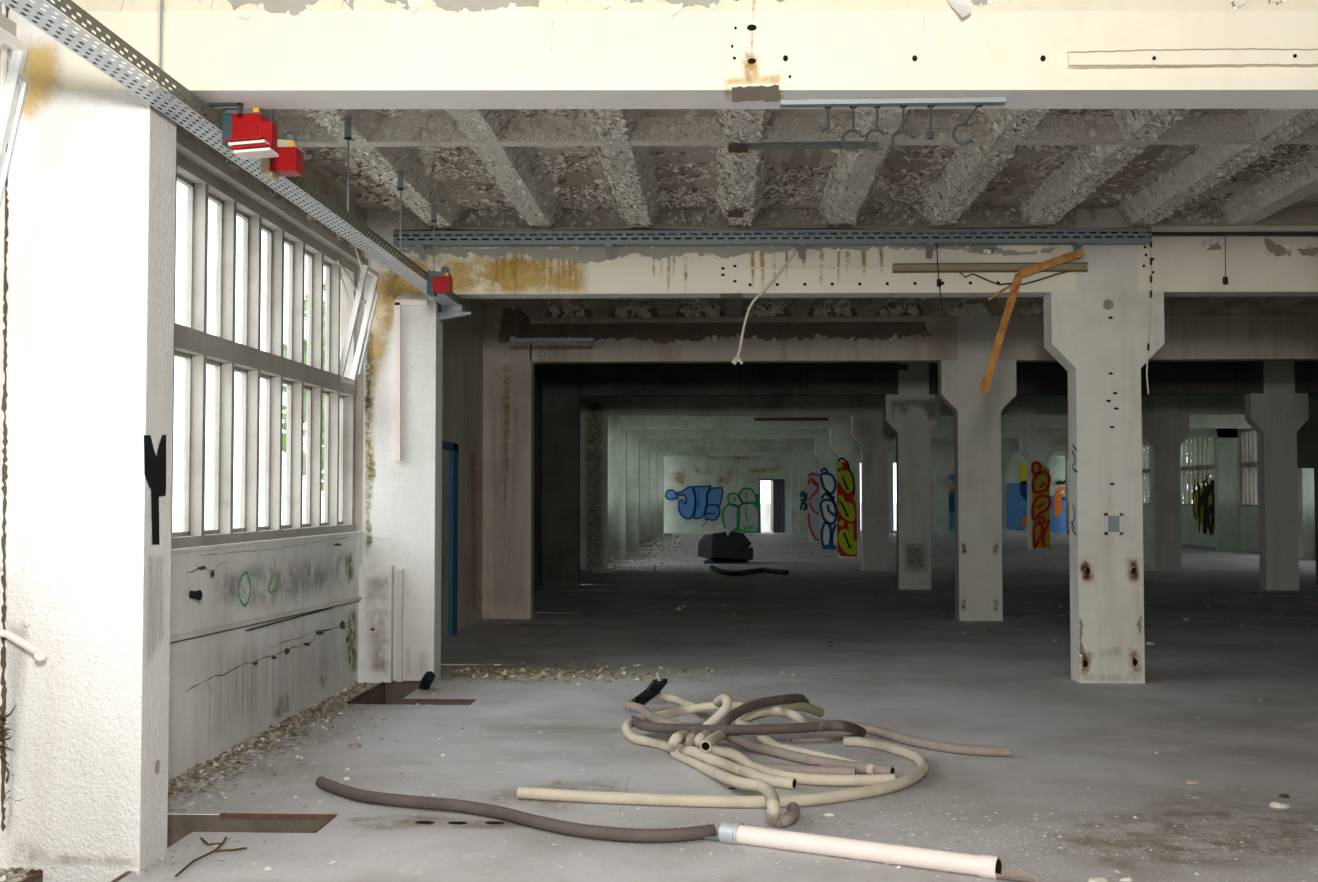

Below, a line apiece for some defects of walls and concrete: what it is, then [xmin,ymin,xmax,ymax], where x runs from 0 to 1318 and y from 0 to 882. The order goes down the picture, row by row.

peeling [199,0,318,19]
peeling [384,0,539,14]
peeling [661,0,723,16]
peeling [948,0,992,17]
water stain [24,49,54,113]
peeling [303,85,1318,265]
crack [0,144,29,831]
rust [1081,562,1091,580]
crack [186,620,355,692]